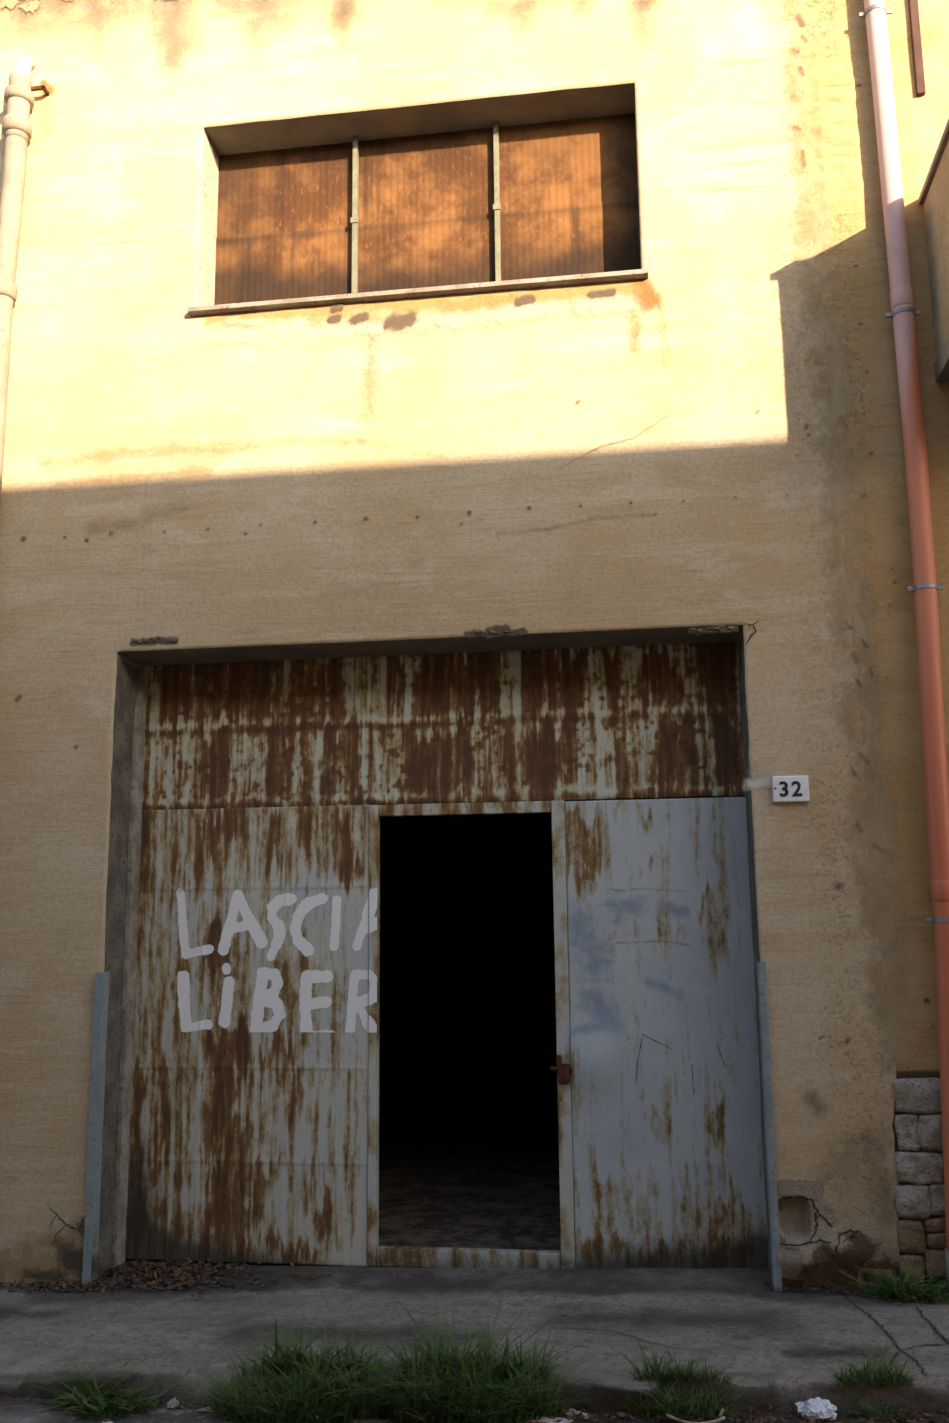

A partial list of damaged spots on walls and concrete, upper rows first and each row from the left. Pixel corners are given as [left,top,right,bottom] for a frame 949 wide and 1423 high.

flaking render [0,0,41,13]
flaking render [214,288,634,352]
flaking render [777,1180,900,1291]